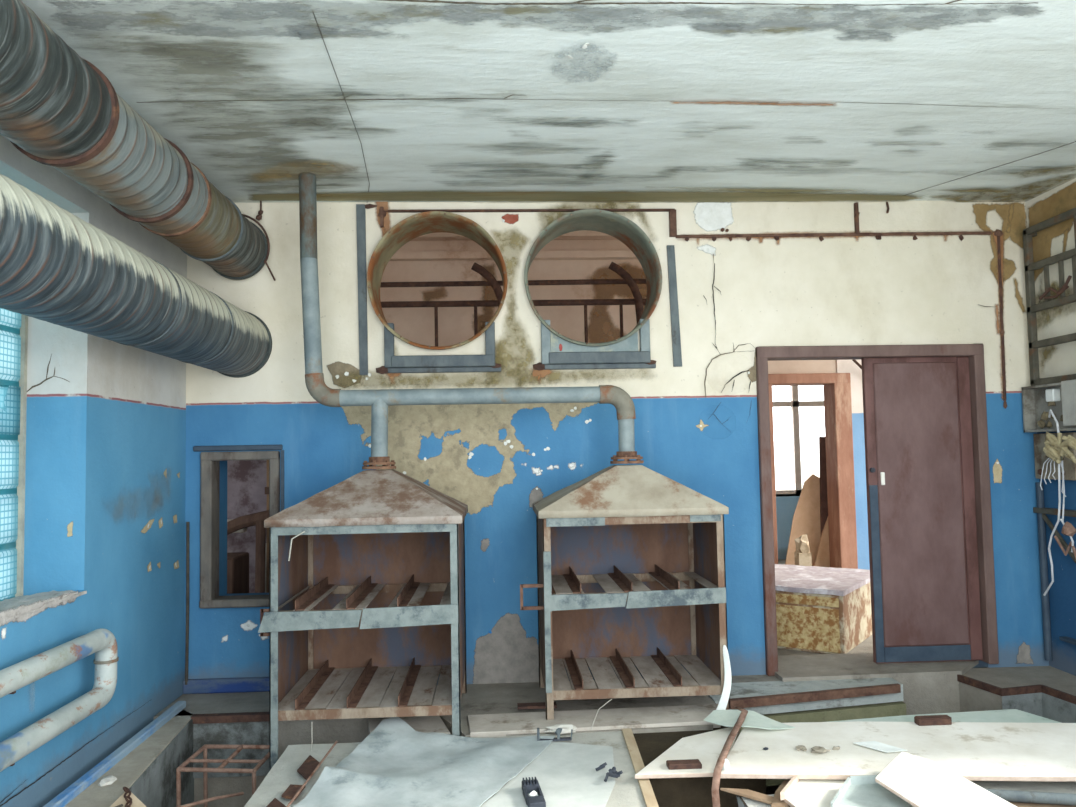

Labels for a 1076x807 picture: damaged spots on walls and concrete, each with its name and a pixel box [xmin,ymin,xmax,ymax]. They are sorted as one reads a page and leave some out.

damp [54,0,1041,228]
damp [340,231,604,387]
crack [703,263,755,427]
damp [934,167,1076,312]
peeling [341,406,371,448]
peeling [376,402,599,515]
flaking render [0,591,78,639]
peeling [473,613,539,684]